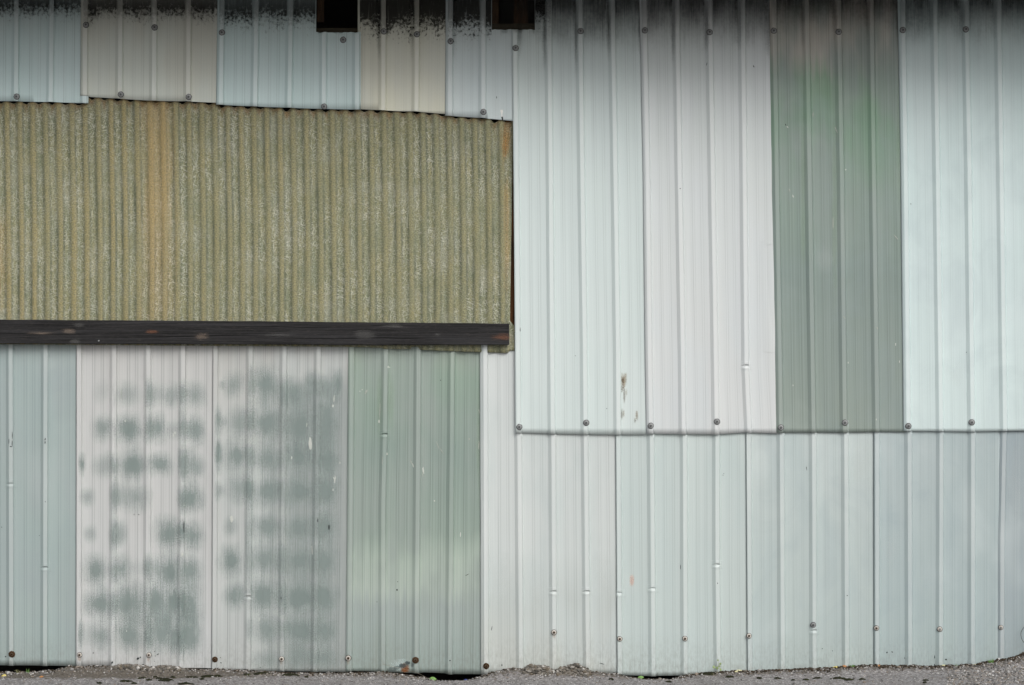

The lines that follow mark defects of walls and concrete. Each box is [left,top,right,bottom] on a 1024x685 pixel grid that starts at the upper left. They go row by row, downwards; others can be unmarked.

damp [0,0,316,25]
damp [360,0,491,39]
damp [517,0,1024,22]
damp [98,419,139,441]
damp [246,374,335,503]
damp [122,454,192,477]
damp [88,559,199,649]
damp [229,517,334,662]